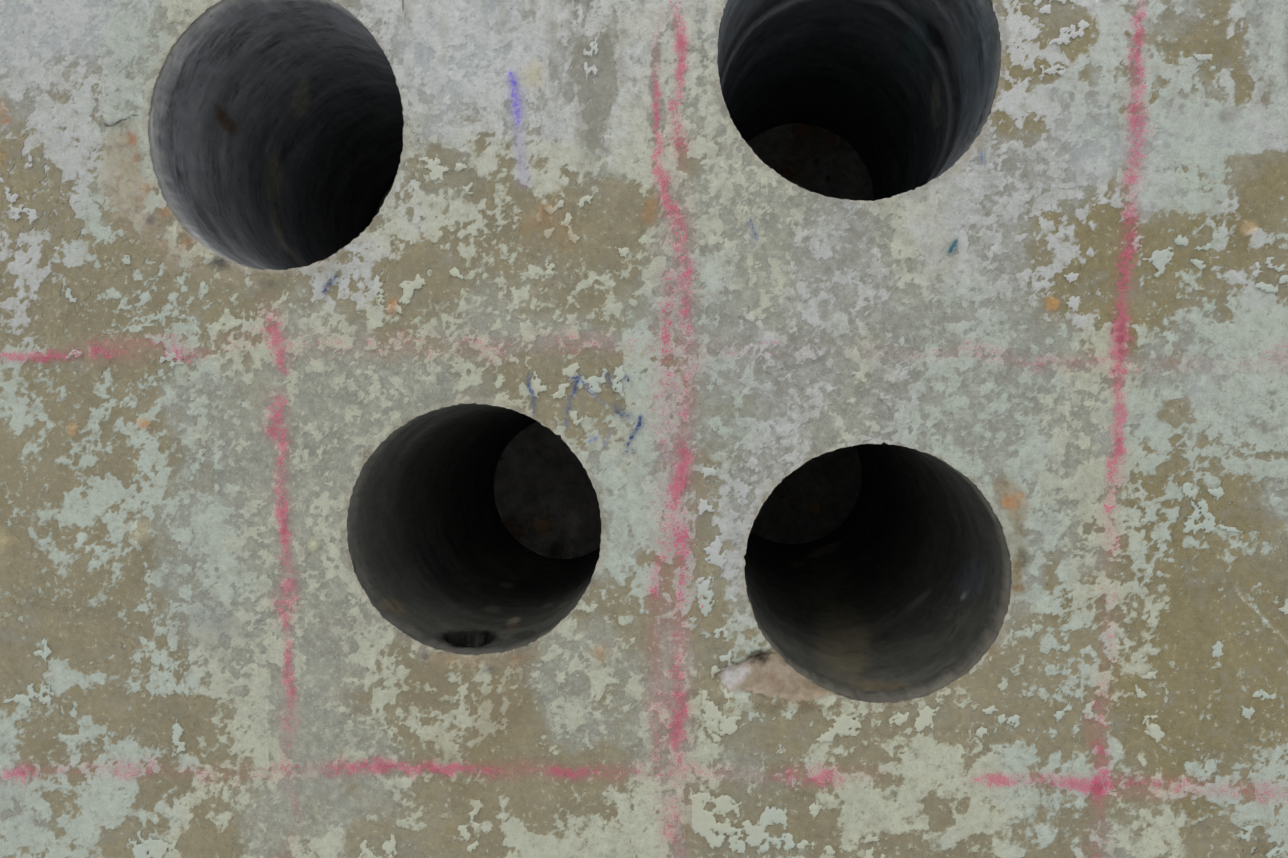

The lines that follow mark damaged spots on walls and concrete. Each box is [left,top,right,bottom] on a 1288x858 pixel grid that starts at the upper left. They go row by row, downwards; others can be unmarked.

peeling [1157,0,1242,74]
peeling [714,0,1100,205]
peeling [1221,147,1288,210]
peeling [1048,207,1288,324]
peeling [1158,396,1198,432]
peeling [341,345,627,677]
peeling [0,519,235,766]
peeling [687,442,1288,764]
peeling [97,815,235,858]
peeling [343,775,510,858]
peeling [679,778,922,858]
peeling [1180,814,1288,858]